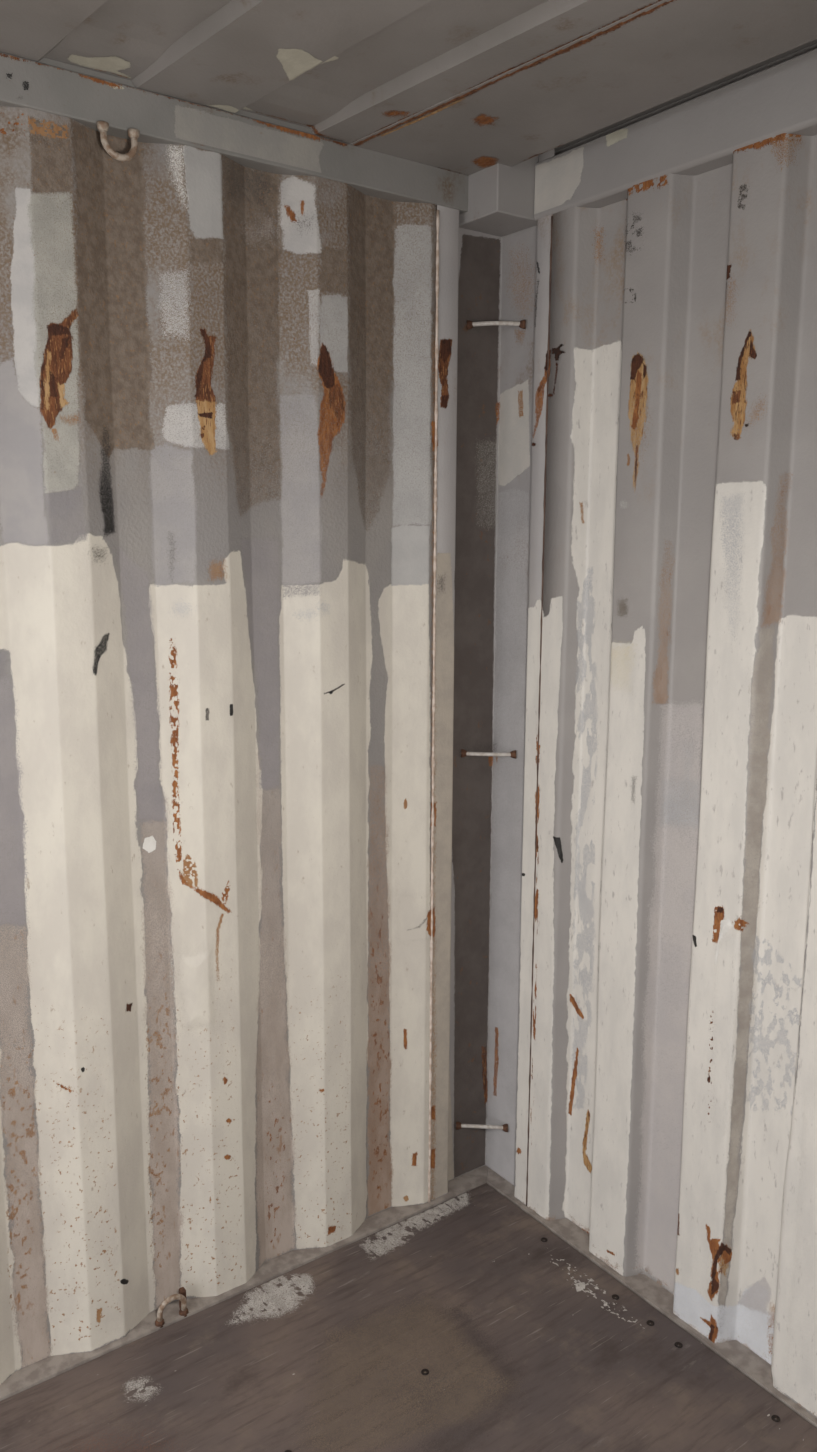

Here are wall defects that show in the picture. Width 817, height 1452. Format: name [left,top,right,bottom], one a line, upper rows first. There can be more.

rust [39,309,81,441]
rust [194,328,217,456]
rust [316,344,347,498]
rust [518,344,564,447]
rust [627,352,653,491]
rust [724,265,767,440]
rust [412,338,452,1200]
rust [125,639,409,1309]
rust [711,905,749,963]
rust [0,922,129,1368]
rust [568,1048,592,1173]
rust [674,1224,775,1359]